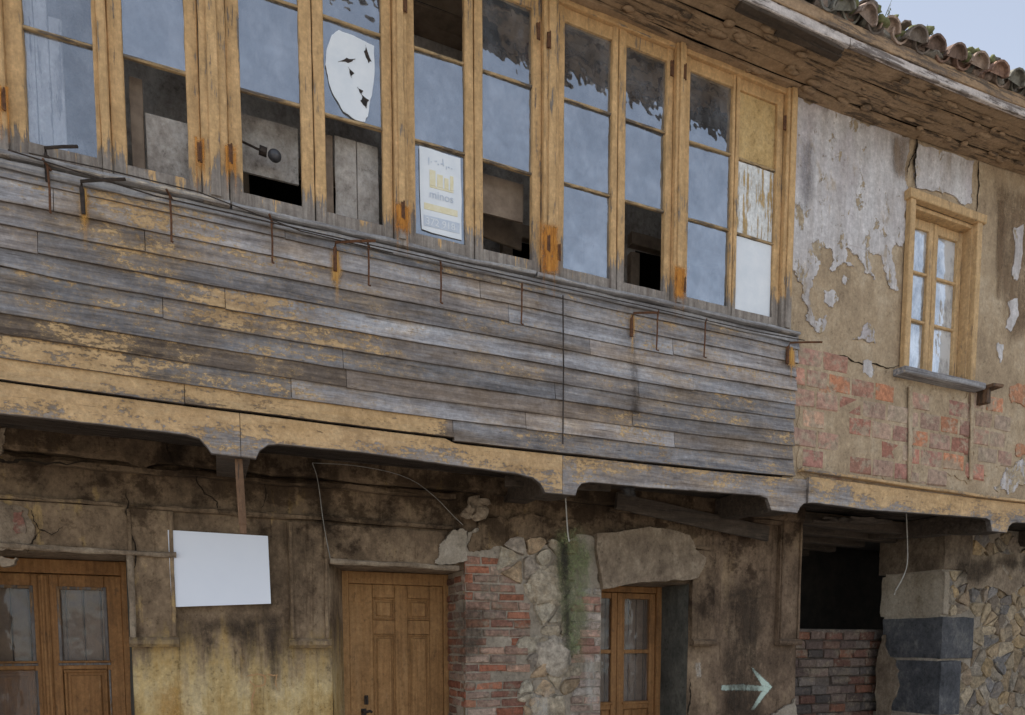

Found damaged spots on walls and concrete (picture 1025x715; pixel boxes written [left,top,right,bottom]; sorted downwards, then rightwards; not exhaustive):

corrosion [540,224,558,272]
peeling [793,97,974,333]
peeling [1011,225,1024,281]
peeling [1005,298,1019,332]
spalling [794,342,1025,495]
spalling [0,501,35,568]
crack [27,510,62,552]
spalling [434,513,707,715]